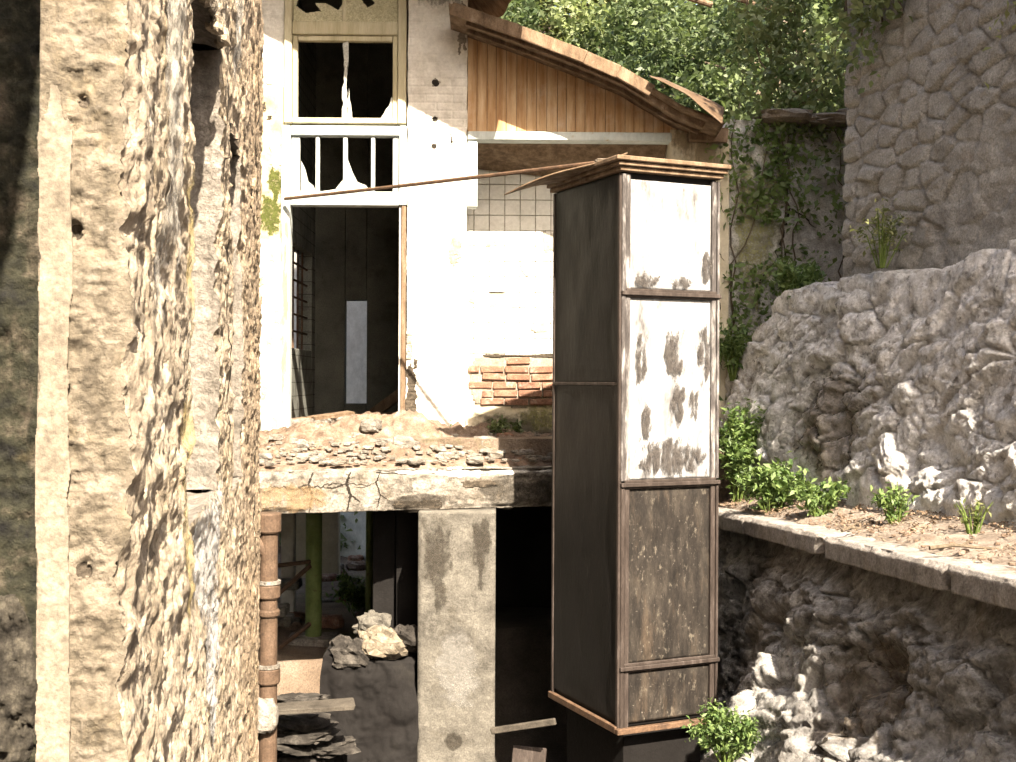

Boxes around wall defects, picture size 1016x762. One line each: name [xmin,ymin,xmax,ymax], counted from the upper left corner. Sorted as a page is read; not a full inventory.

crack [253,54,261,200]
flaking render [468,353,553,408]
crack [253,443,388,596]
water stain [423,524,452,608]
water stain [473,519,492,589]